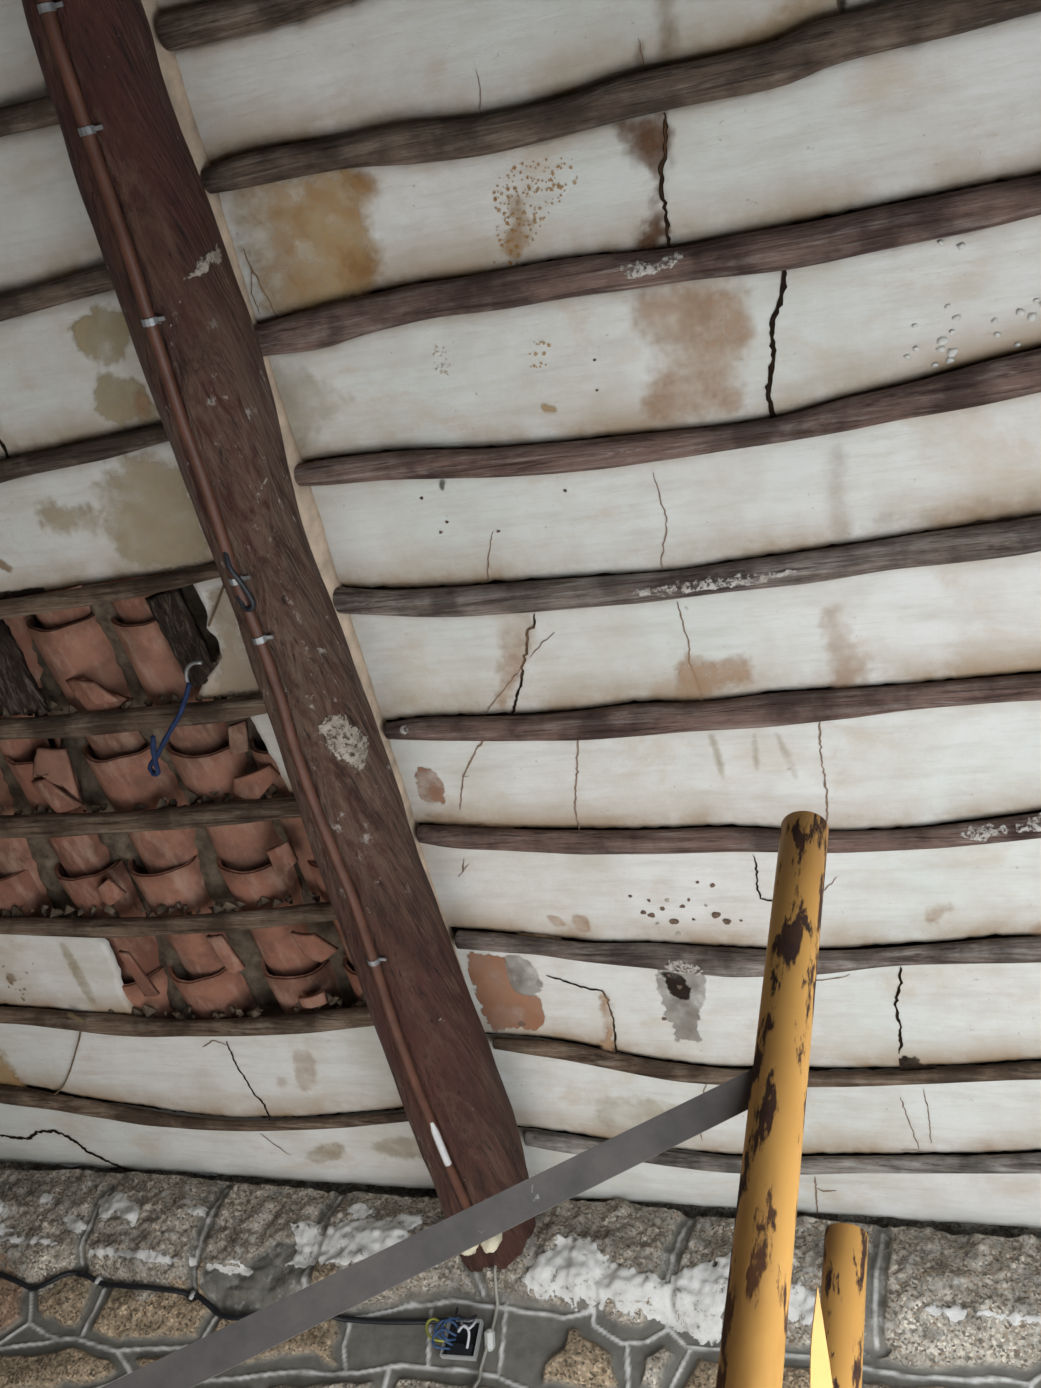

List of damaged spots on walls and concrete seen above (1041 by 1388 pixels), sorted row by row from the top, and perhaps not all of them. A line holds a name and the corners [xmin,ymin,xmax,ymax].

water stain [250,170,378,310]
corrosion [492,158,578,266]
crack [658,112,672,248]
water stain [71,307,156,427]
crack [765,270,787,418]
water stain [106,456,208,569]
crack [459,614,555,808]
crack [753,856,772,902]
flaking render [467,952,545,1032]
flaking render [656,960,706,1042]
water stain [0,1056,24,1087]
crack [0,1129,134,1172]